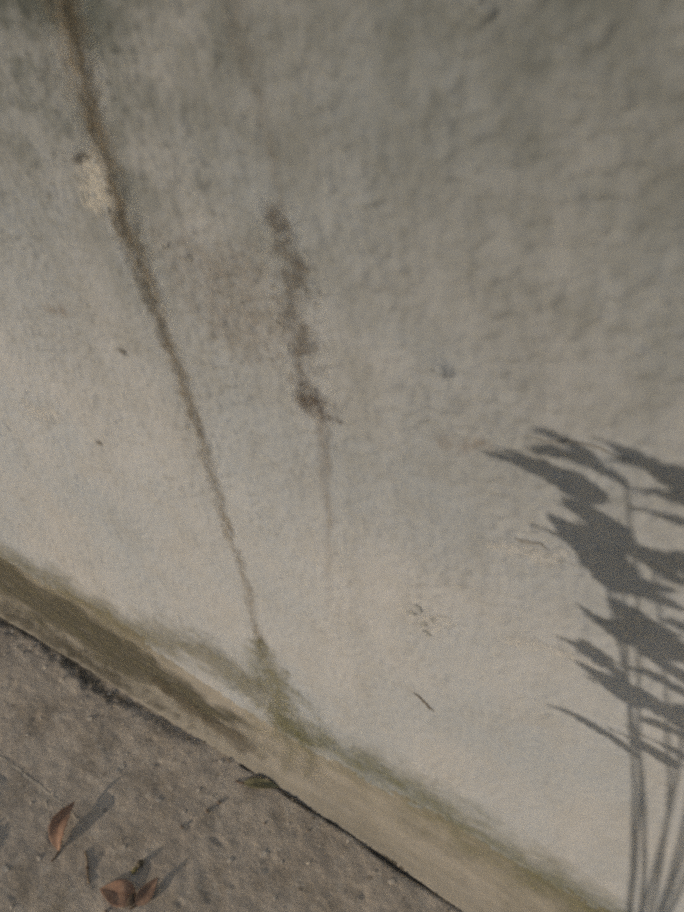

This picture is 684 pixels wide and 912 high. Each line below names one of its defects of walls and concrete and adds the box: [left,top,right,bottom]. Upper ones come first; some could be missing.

water stain [0,563,243,743]